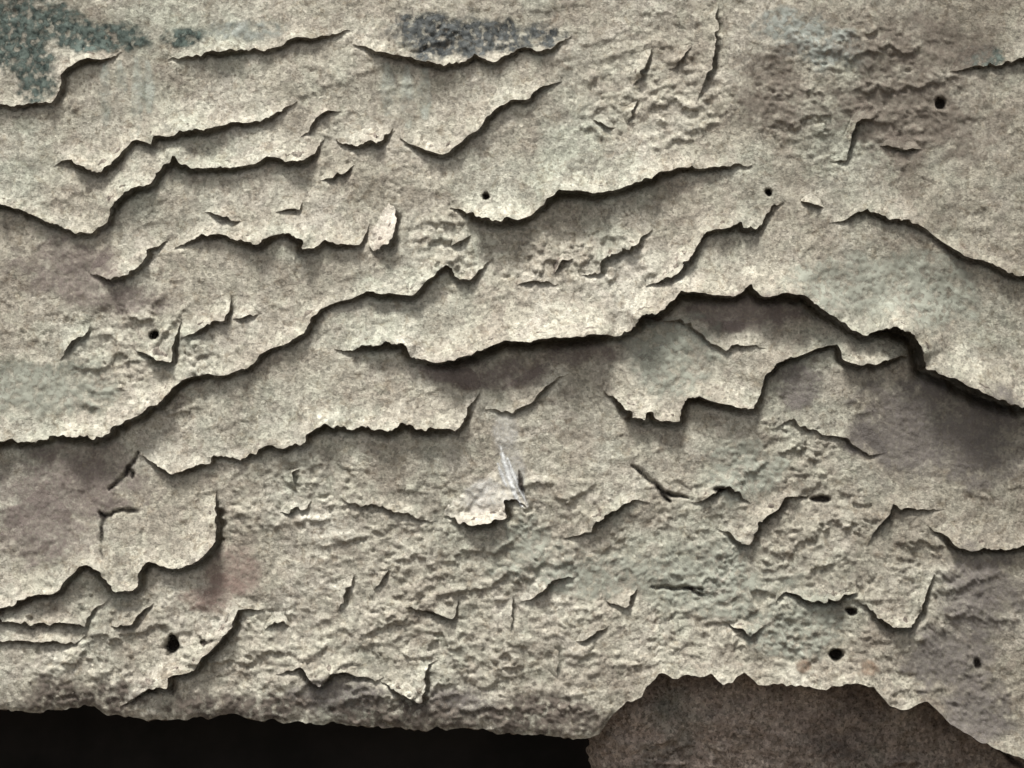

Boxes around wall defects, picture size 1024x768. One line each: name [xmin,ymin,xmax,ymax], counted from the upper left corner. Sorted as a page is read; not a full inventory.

peeling [0,0,1024,474]
peeling [279,468,311,514]
peeling [340,461,528,526]
peeling [563,467,650,538]
crack [633,466,683,501]
peeling [691,453,812,545]
peeling [864,480,1024,551]
peeling [0,470,217,644]
peeling [404,586,458,619]
peeling [500,551,577,632]
peeling [775,550,935,629]
peeling [109,575,438,718]